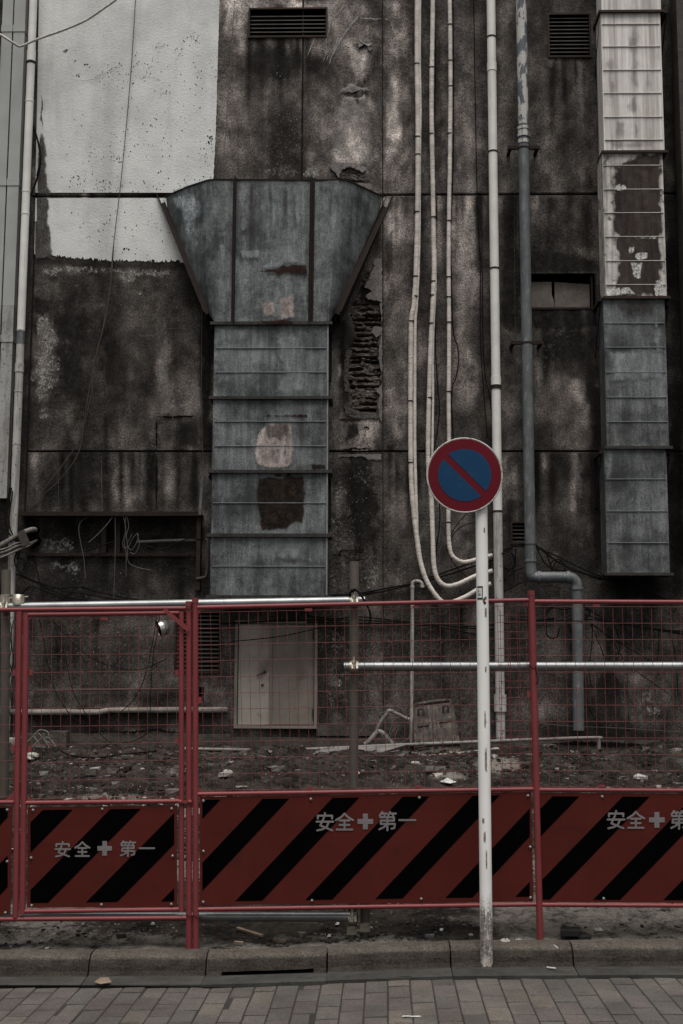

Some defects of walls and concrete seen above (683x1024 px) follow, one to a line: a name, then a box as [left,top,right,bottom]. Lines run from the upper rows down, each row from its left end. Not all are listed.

water stain [69,97,219,196]
peeling [606,237,656,296]
water stain [31,298,103,419]
spalling [343,258,383,429]